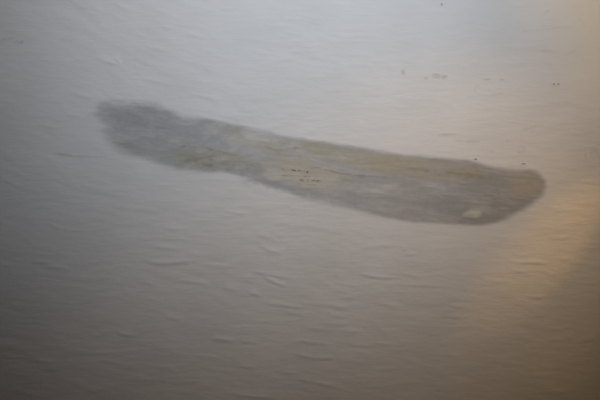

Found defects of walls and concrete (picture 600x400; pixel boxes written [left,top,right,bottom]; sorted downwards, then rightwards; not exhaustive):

damp [86,97,549,228]